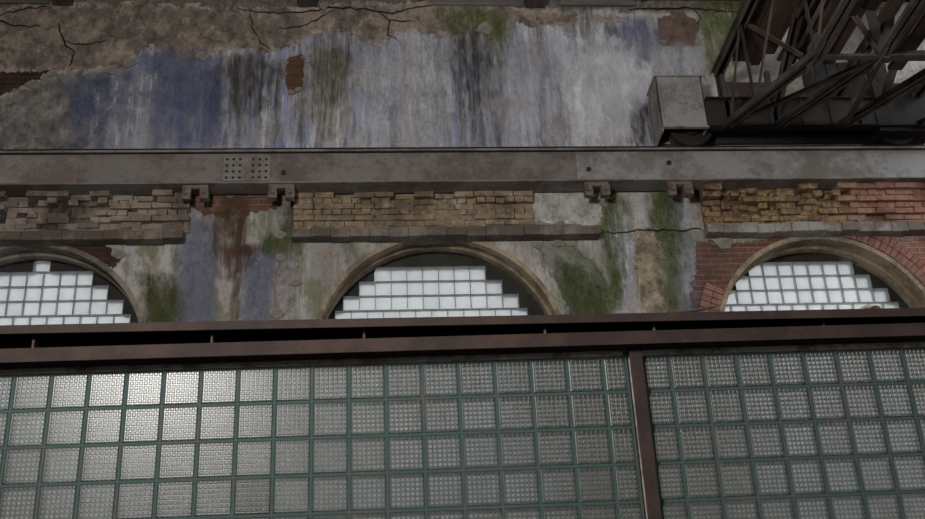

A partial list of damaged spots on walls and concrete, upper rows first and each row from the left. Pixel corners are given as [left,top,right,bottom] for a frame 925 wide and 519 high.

crack [0,6,106,66]
leakage [66,51,281,149]
peeling [0,0,629,149]
crack [232,5,432,51]
leakage [376,14,699,146]
peeling [885,61,925,83]
spalling [70,245,127,269]
leakage [575,203,633,314]
spalling [689,237,789,312]
spalling [867,235,925,282]